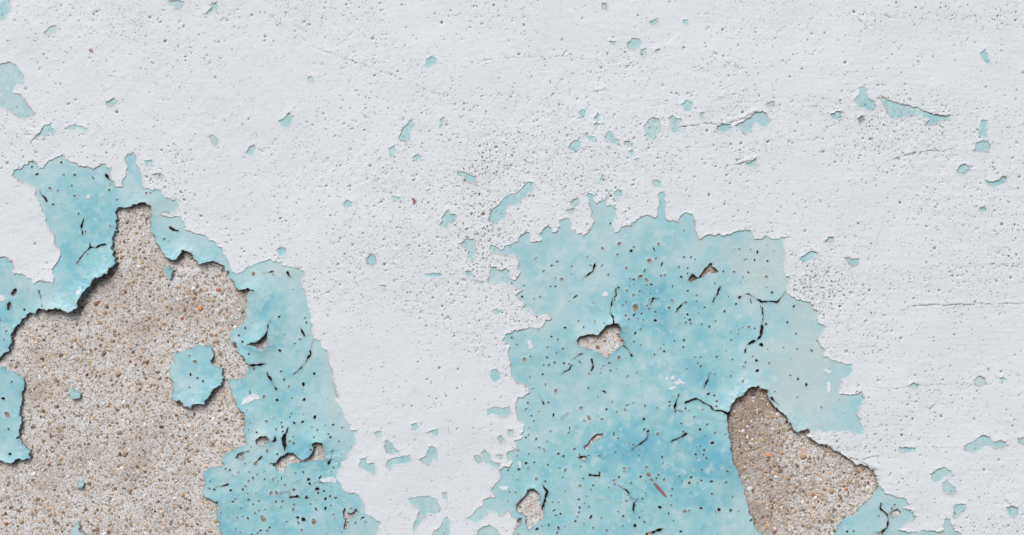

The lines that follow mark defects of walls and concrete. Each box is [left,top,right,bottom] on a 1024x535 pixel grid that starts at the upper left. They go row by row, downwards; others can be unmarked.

peeling [0,62,35,119]
peeling [717,102,774,133]
peeling [854,87,950,125]
spalling [0,153,381,535]
peeling [460,180,966,535]